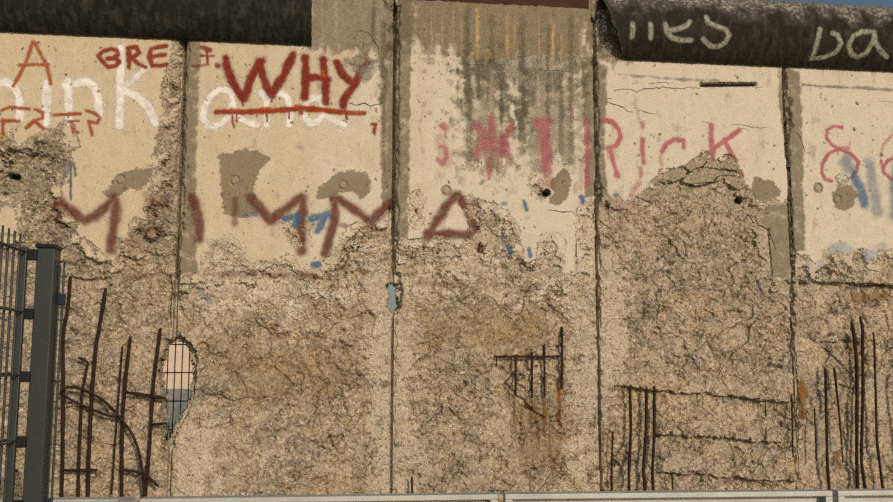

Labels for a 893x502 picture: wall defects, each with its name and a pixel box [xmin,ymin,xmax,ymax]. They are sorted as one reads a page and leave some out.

damp [308,0,629,170]
spalling [0,39,399,502]
spalling [391,66,893,502]
rust [59,277,166,497]
rust [496,326,563,430]
rust [642,386,656,491]
rust [791,367,843,490]
rust [850,316,884,489]